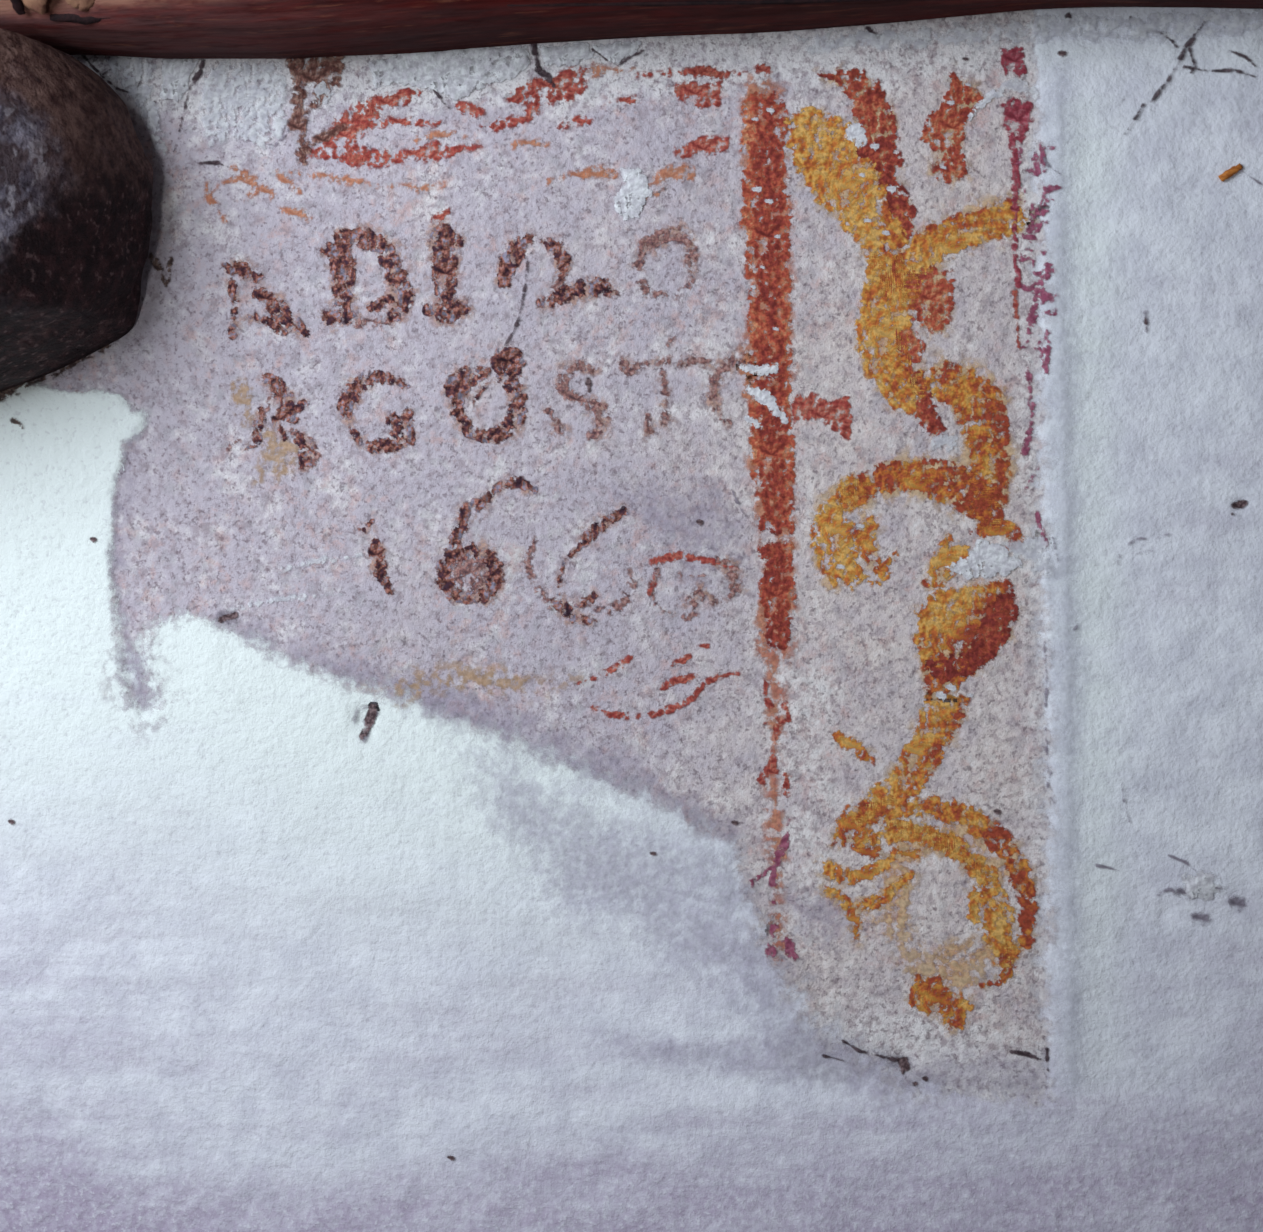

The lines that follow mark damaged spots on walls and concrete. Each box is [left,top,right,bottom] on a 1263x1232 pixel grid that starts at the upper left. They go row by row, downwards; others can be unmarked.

crack [1125,16,1256,134]